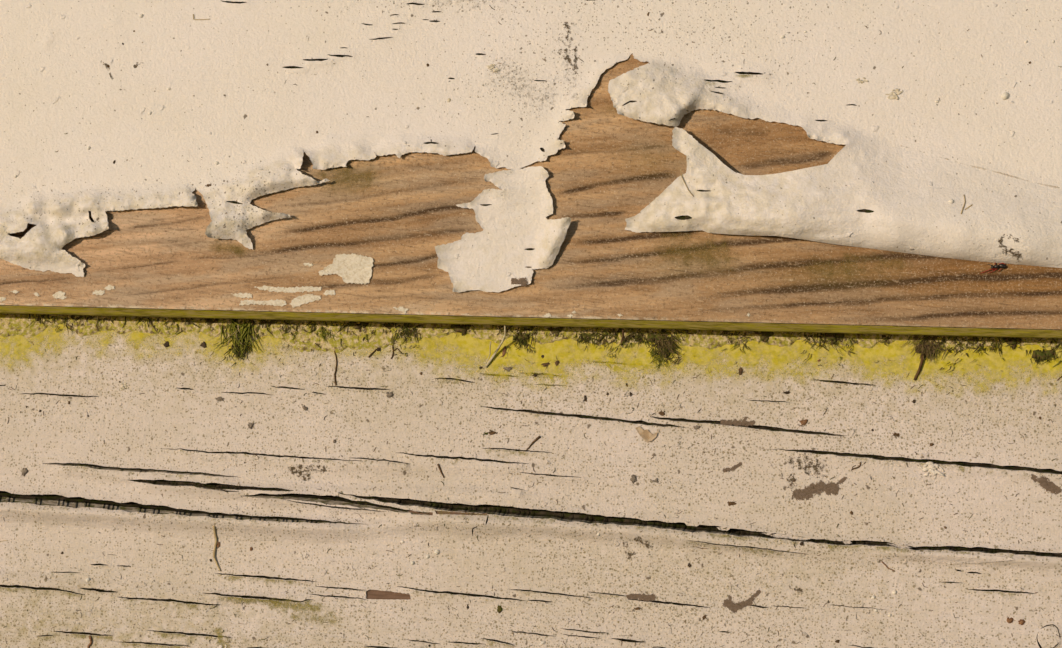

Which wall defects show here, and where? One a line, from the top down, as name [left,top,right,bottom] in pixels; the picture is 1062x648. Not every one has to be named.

peeling [0,53,1062,293]
peeling [231,253,374,308]
crack [435,372,1062,475]
crack [0,448,1062,594]